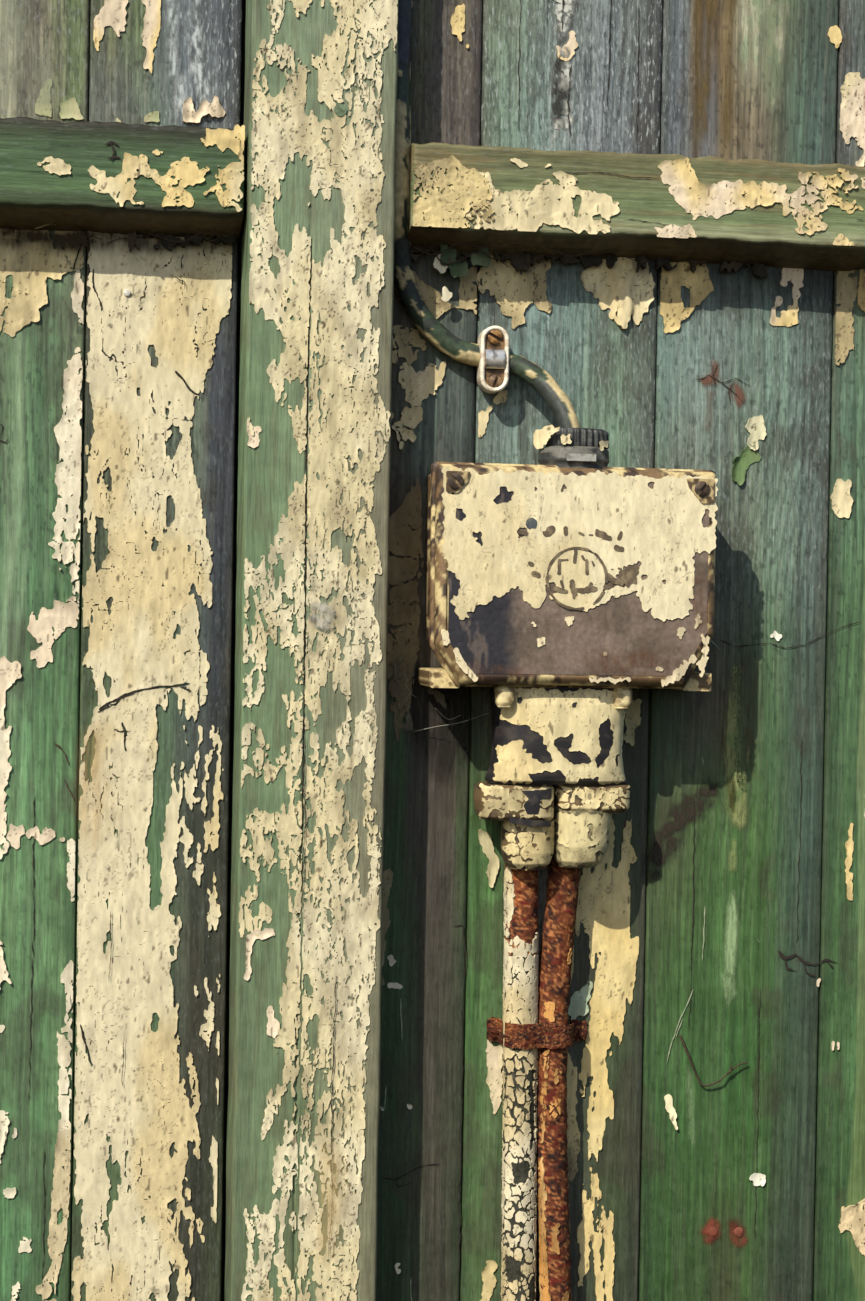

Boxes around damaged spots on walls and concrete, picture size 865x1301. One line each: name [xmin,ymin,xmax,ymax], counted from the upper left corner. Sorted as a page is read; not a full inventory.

peeling [827,25,842,48]
peeling [35,78,84,120]
peeling [37,156,71,176]
peeling [654,72,865,246]
peeling [580,257,714,333]
peeling [770,268,804,327]
peeling [830,479,853,518]
peeling [87,0,447,1301]
crack [99,684,191,749]
peeling [0,228,232,1301]
peeling [478,819,639,1301]
peeling [838,1198,865,1256]